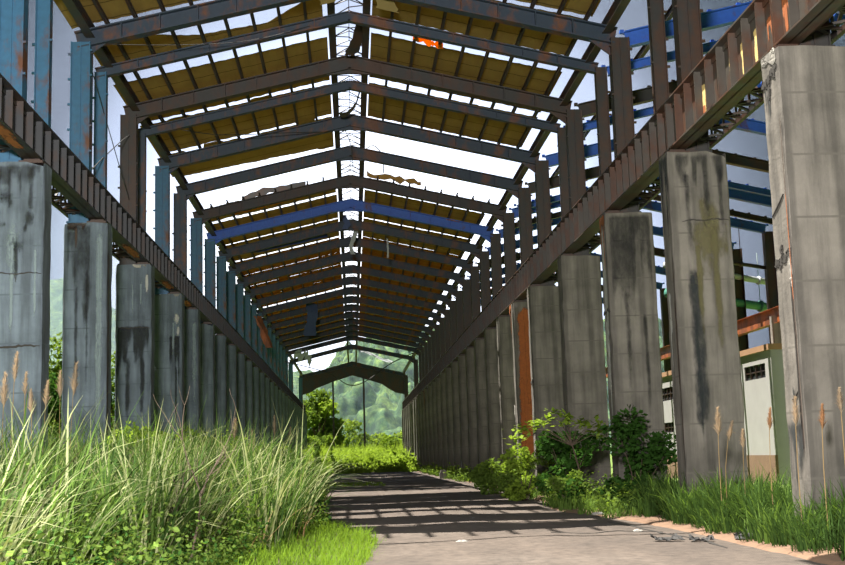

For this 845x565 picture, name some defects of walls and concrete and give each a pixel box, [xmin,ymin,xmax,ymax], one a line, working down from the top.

spalling [761,48,776,67]